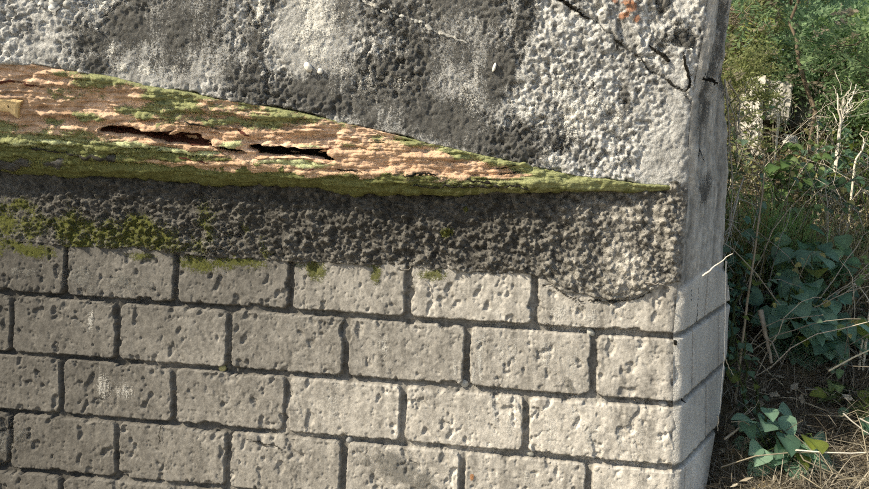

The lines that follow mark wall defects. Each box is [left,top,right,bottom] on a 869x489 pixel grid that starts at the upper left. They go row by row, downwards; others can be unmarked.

corrosion [612,0,640,23]
crack [558,0,718,103]
damp [62,0,641,175]
damp [9,139,74,147]
damp [360,451,437,489]